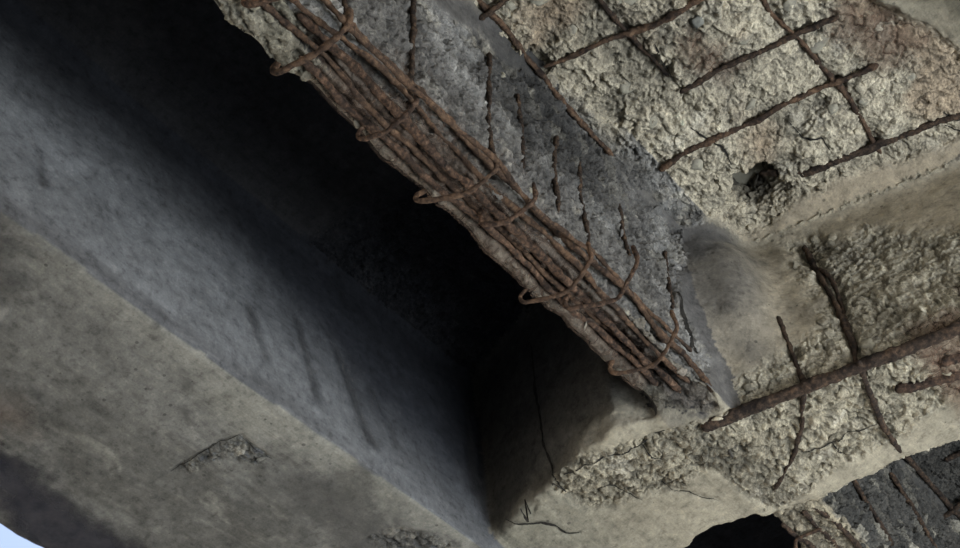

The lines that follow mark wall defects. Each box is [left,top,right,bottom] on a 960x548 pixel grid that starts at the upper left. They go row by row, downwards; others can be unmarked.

spalling [215,0,960,548]
spalling [175,437,268,472]
crack [506,499,579,534]
crack [531,345,716,500]